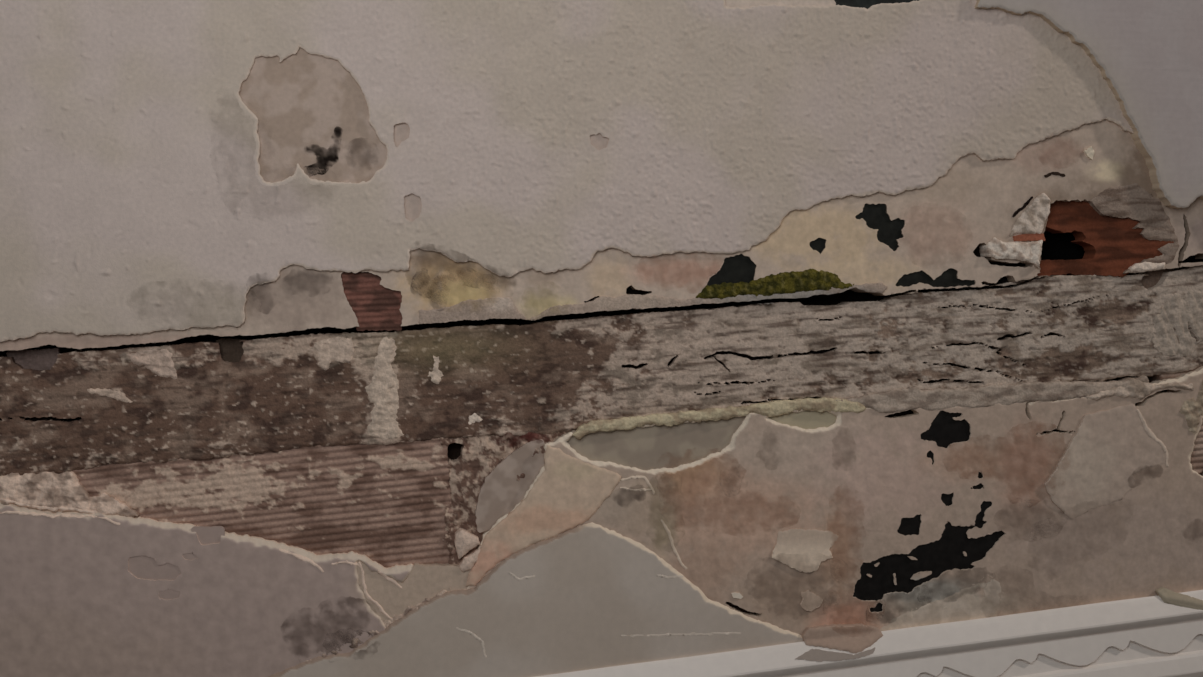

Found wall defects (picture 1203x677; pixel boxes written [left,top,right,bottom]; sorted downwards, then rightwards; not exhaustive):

peeling [725,0,919,9]
flaking render [239,47,410,183]
flaking render [419,254,976,324]
peeling [810,238,826,254]
peeling [855,204,904,251]
flaking render [979,193,1051,268]
flaking render [1128,262,1165,272]
crack [0,287,1075,404]
peeling [921,411,970,465]
flaking render [1043,403,1166,520]
flaking render [357,416,745,625]
peeling [796,472,1005,662]